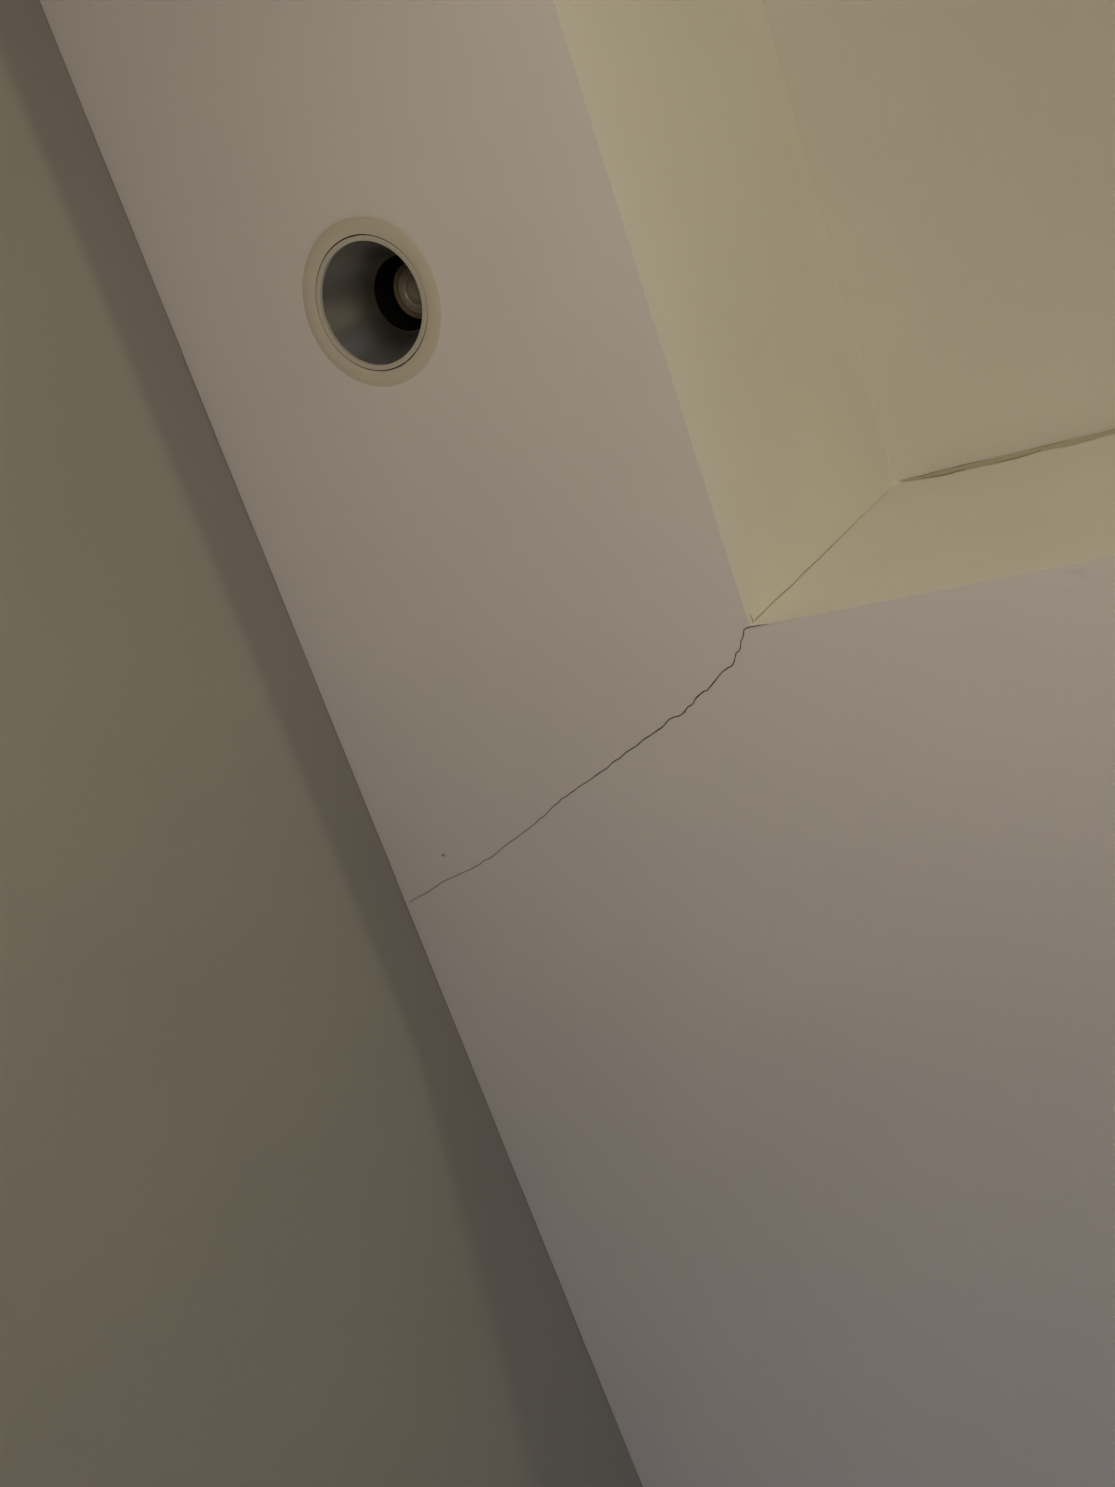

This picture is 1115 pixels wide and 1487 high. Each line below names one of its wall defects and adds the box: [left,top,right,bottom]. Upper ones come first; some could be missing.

crack [39,1,887,1485]